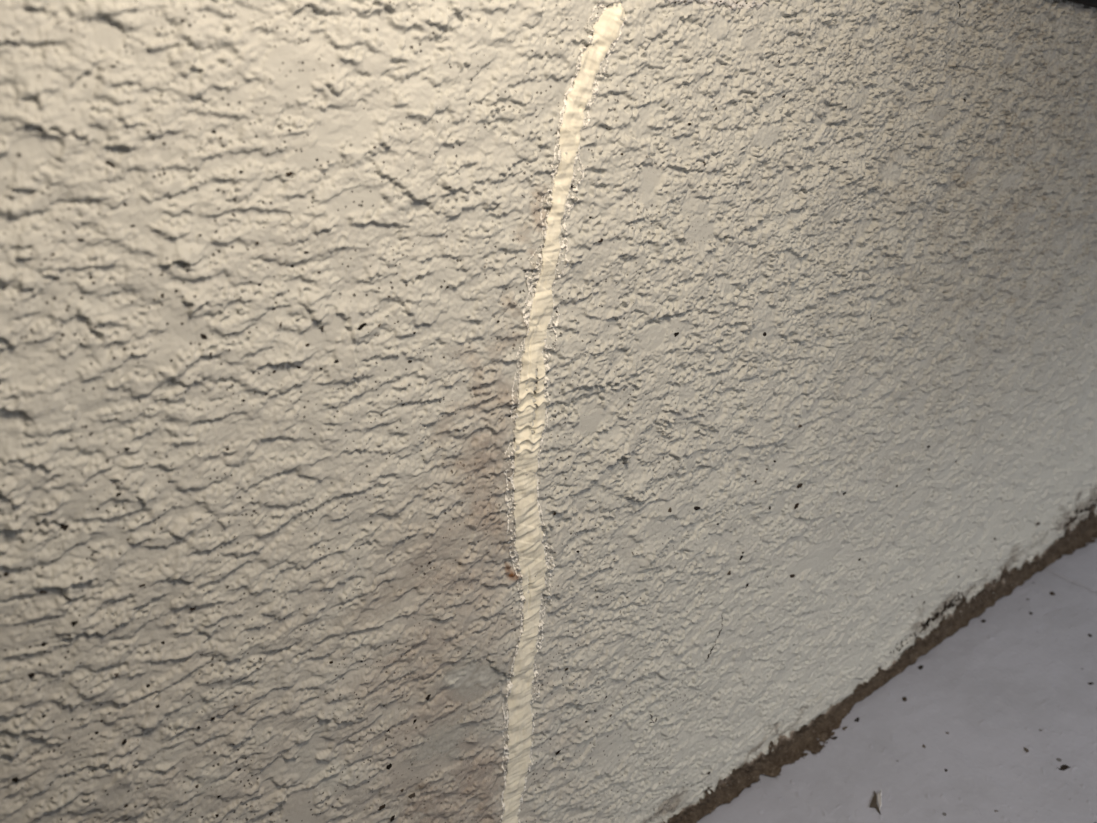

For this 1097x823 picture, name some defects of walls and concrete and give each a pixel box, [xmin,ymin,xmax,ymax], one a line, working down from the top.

crack [499,2,627,823]